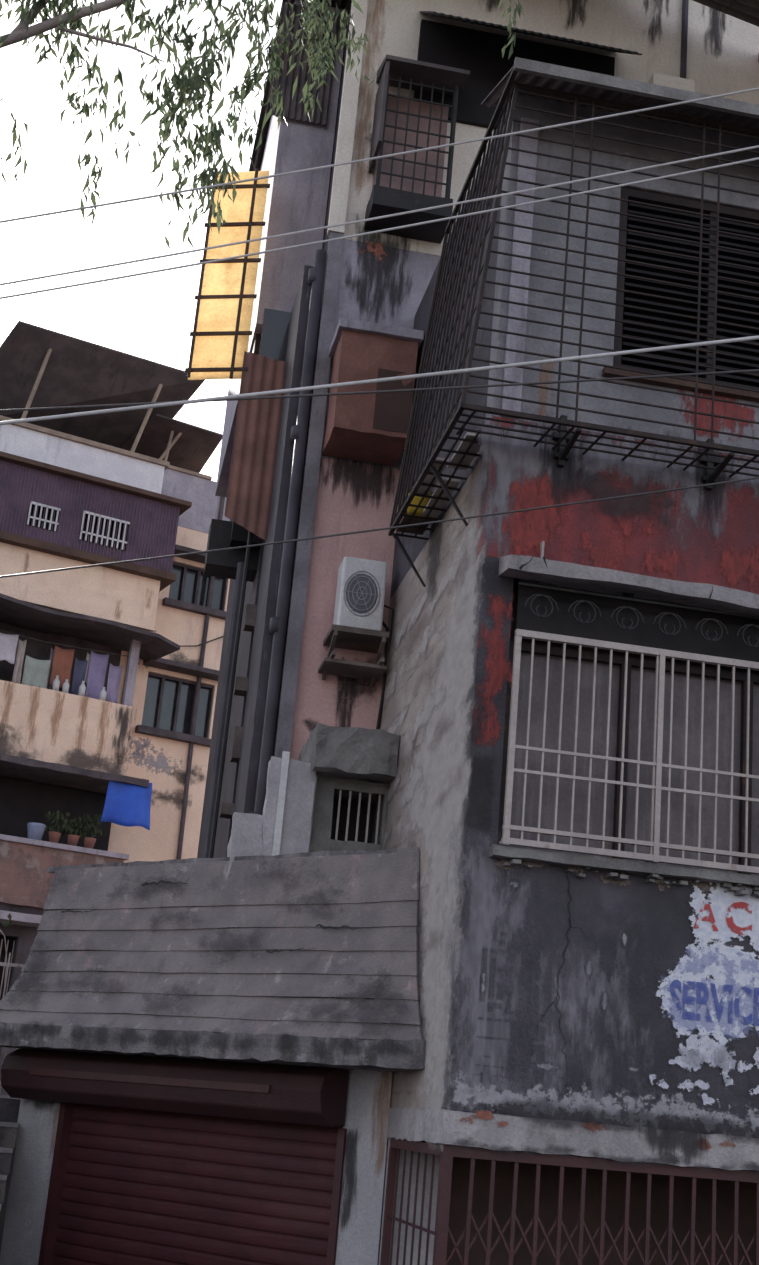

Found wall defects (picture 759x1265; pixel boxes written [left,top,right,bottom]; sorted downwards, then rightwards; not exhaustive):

damp [567,0,586,27]
damp [645,0,669,42]
damp [703,8,725,55]
damp [346,220,410,323]
damp [320,458,394,504]
peeling [502,472,653,571]
damp [336,676,376,727]
damp [0,724,29,758]
damp [66,708,132,775]
crack [531,868,588,1097]
damp [445,757,759,1161]
spalling [460,1110,508,1127]